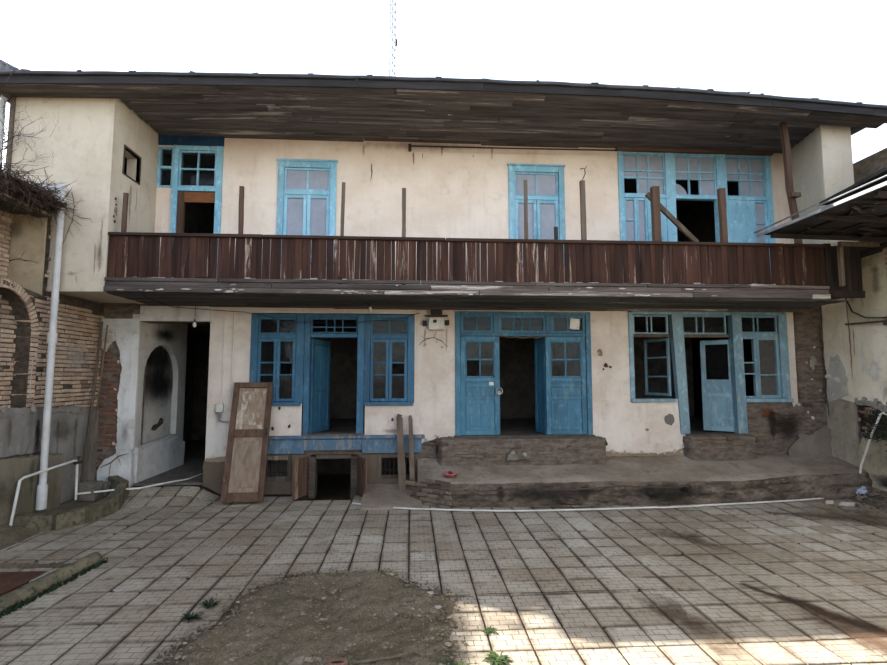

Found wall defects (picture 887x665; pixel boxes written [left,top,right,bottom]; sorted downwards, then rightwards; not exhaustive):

water stain [147,347,168,370]
flaking render [0,328,121,478]
water stain [770,411,798,436]
flaking render [854,397,887,436]